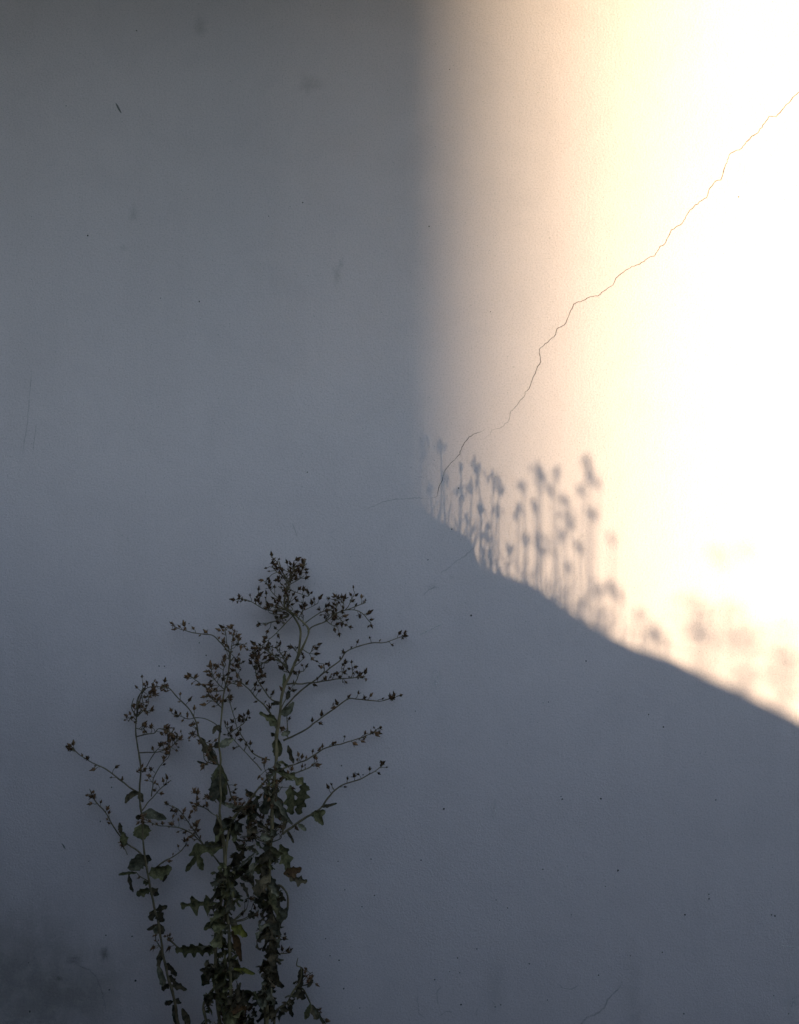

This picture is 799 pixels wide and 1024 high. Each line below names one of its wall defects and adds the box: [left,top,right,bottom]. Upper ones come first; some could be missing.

crack [510,92,799,413]